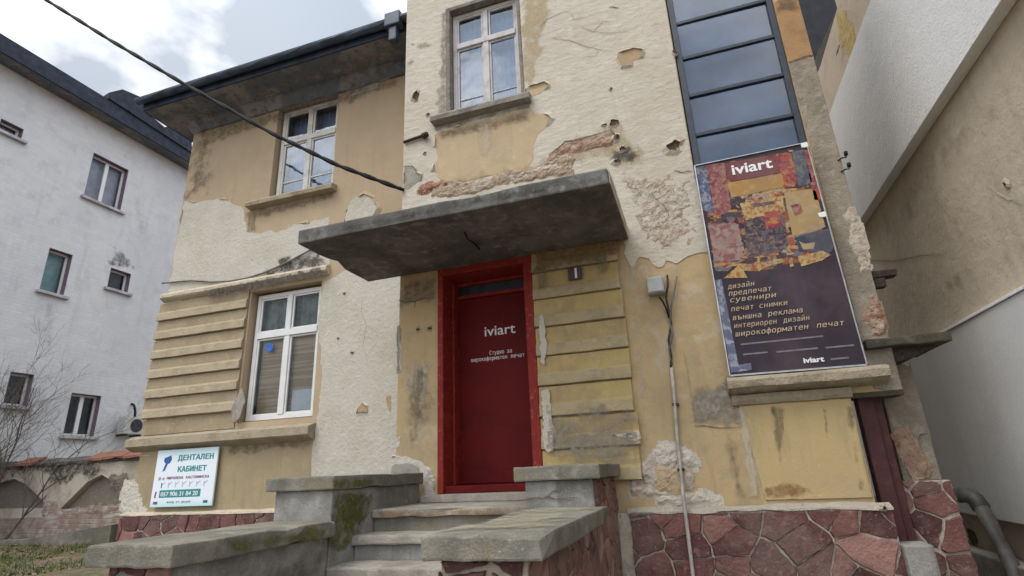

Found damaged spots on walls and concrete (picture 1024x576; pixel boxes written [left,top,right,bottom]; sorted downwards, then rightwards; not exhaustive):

peeling [616,47,645,69]
peeling [166,191,382,304]
peeling [402,80,626,198]
flaking render [774,0,903,390]
spalling [627,440,724,507]
water stain [739,409,804,496]